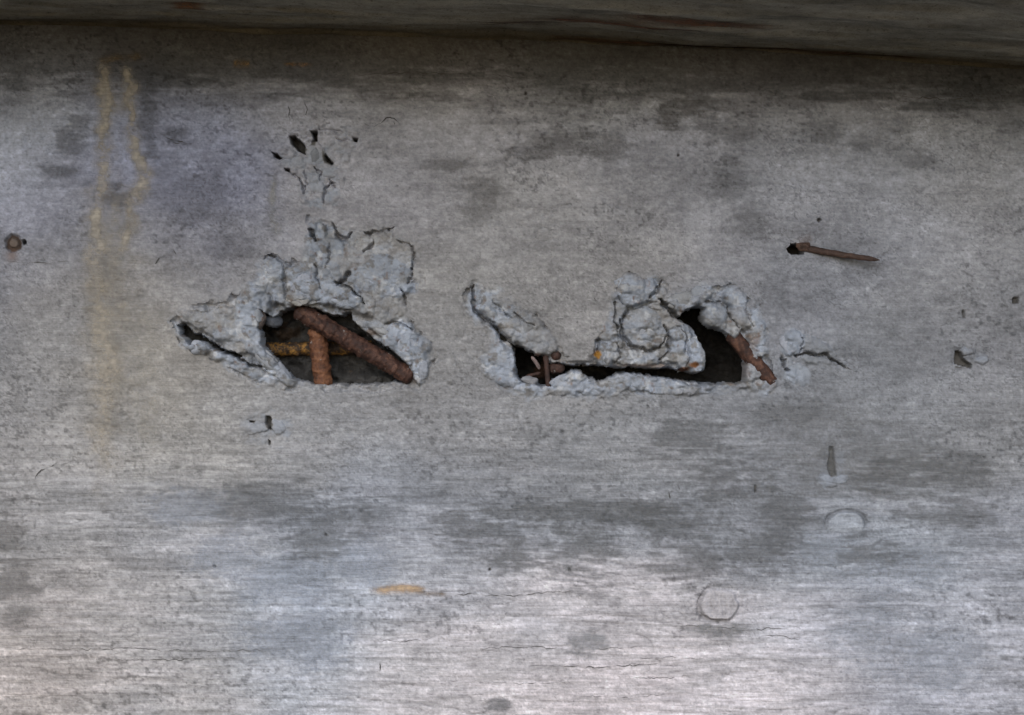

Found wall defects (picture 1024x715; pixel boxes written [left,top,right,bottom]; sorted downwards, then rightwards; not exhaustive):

spalling [167,121,438,397]
rust [796,242,810,251]
spalling [459,268,853,405]